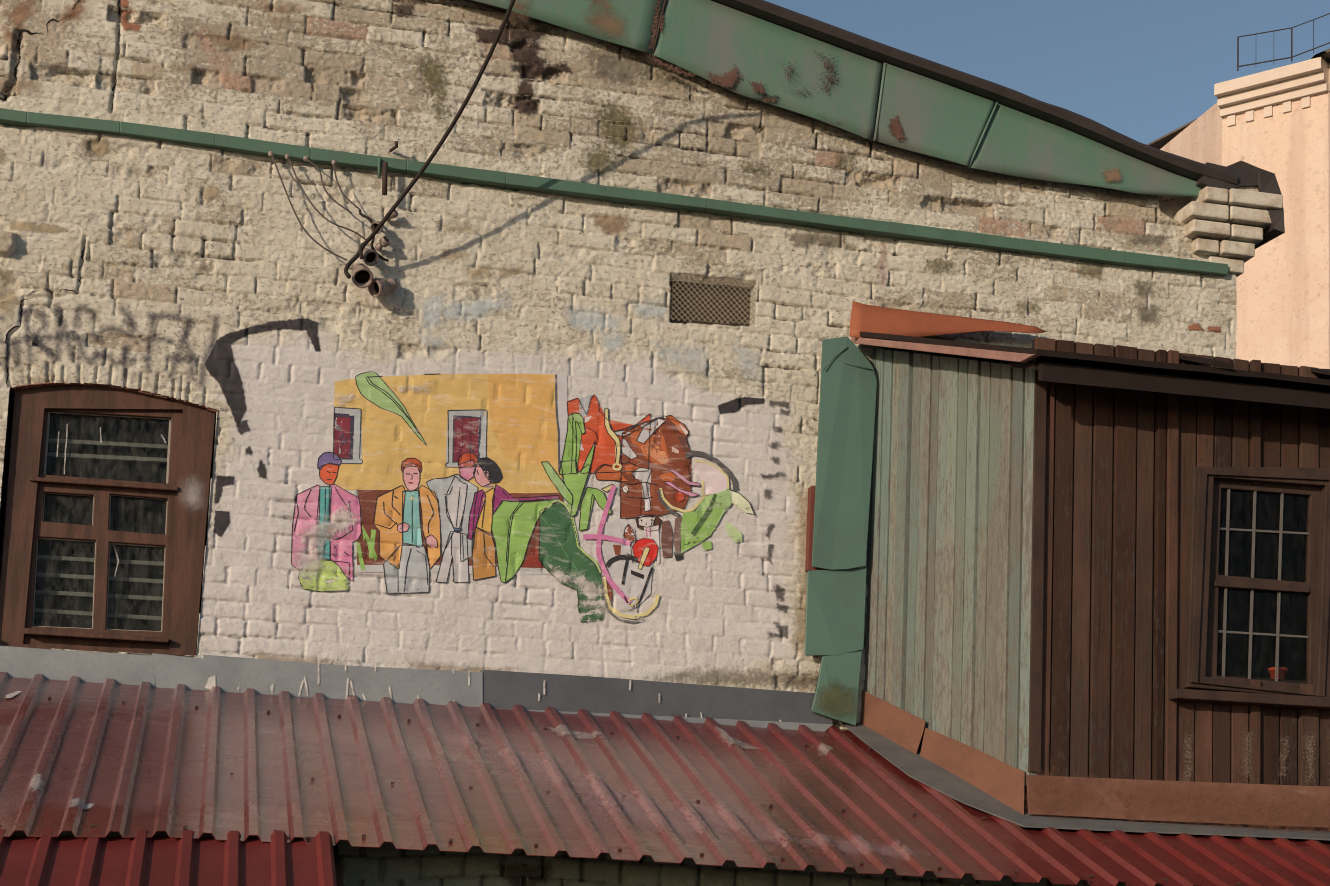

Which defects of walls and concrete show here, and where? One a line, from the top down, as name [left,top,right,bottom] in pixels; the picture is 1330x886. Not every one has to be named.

crack [0,0,79,101]
crack [111,0,121,111]
spalling [120,0,141,33]
water stain [475,26,572,115]
corrosion [646,0,842,104]
crack [5,240,86,386]